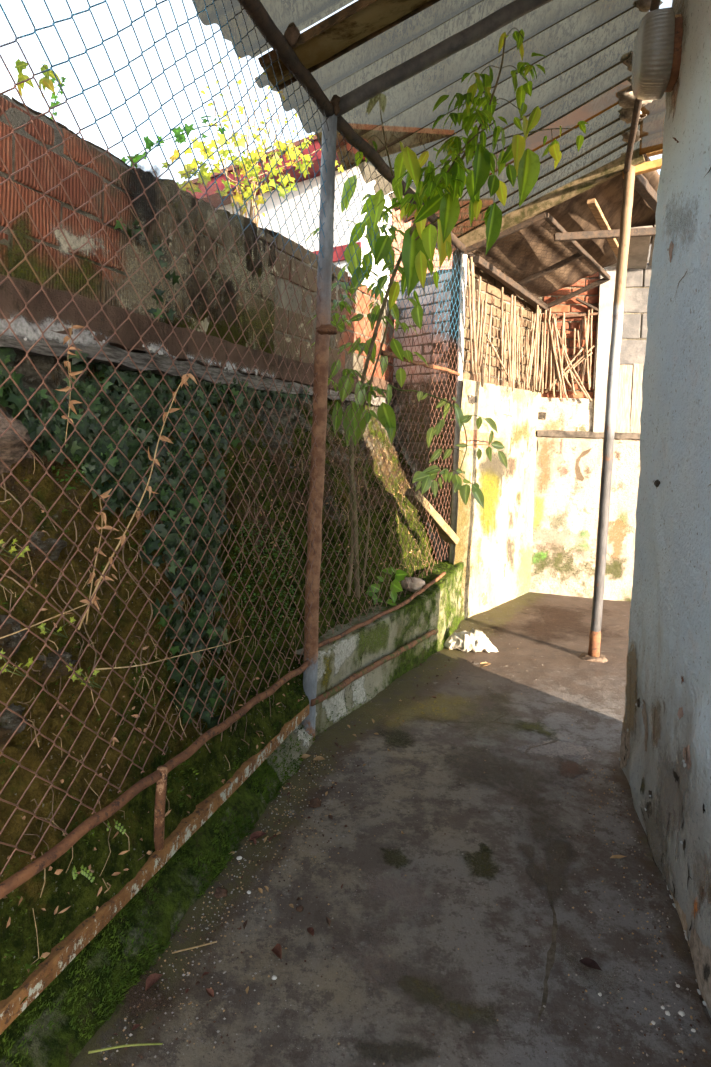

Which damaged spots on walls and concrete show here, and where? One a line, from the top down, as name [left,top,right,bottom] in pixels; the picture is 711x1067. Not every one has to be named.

water stain [469,438,516,498]
water stain [527,419,563,492]
water stain [575,448,592,481]
water stain [504,492,521,577]
water stain [531,547,626,586]
spalling [533,521,626,562]